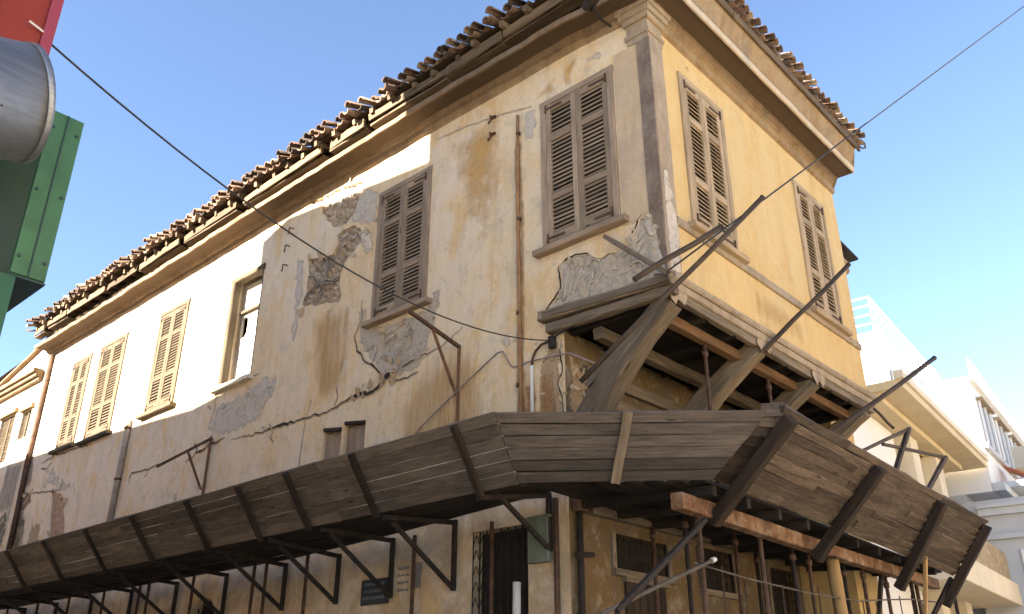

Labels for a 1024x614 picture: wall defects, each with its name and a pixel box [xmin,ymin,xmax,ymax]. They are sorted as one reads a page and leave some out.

spalling [291,177,378,341]
peeling [545,170,681,310]
peeling [203,377,276,445]
crack [185,300,463,467]
peeling [359,290,440,377]